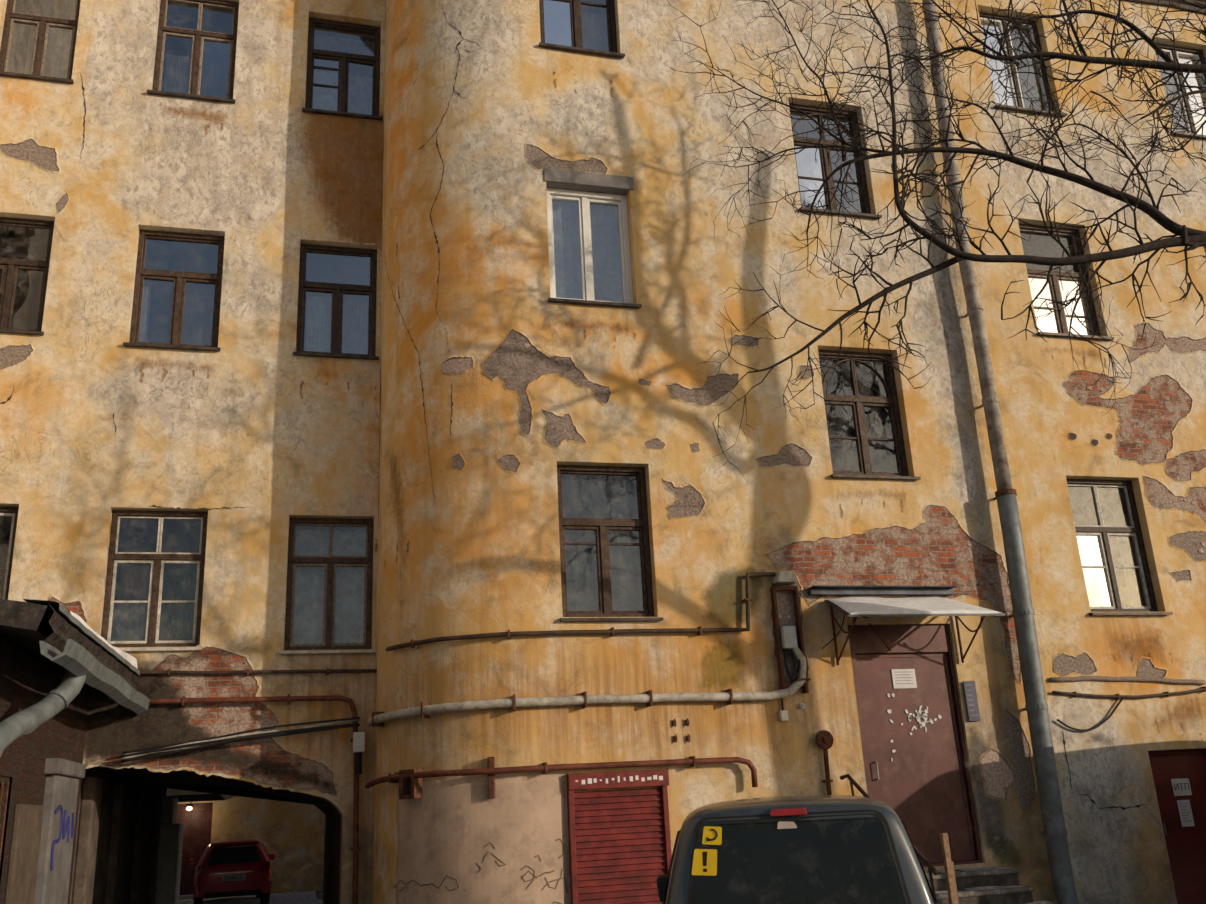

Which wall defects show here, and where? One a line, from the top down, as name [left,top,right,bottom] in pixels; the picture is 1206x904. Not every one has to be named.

flaking render [0,137,61,174]
crack [417,8,483,351]
flaking render [0,342,36,372]
crack [384,229,453,522]
flaking render [439,328,612,450]
flaking render [638,371,740,408]
flaking render [754,442,814,469]
flaking render [1062,368,1206,583]
flaking render [765,503,1022,692]
flaking render [83,644,338,797]
leakage [702,642,740,687]
crack [1063,734,1149,810]